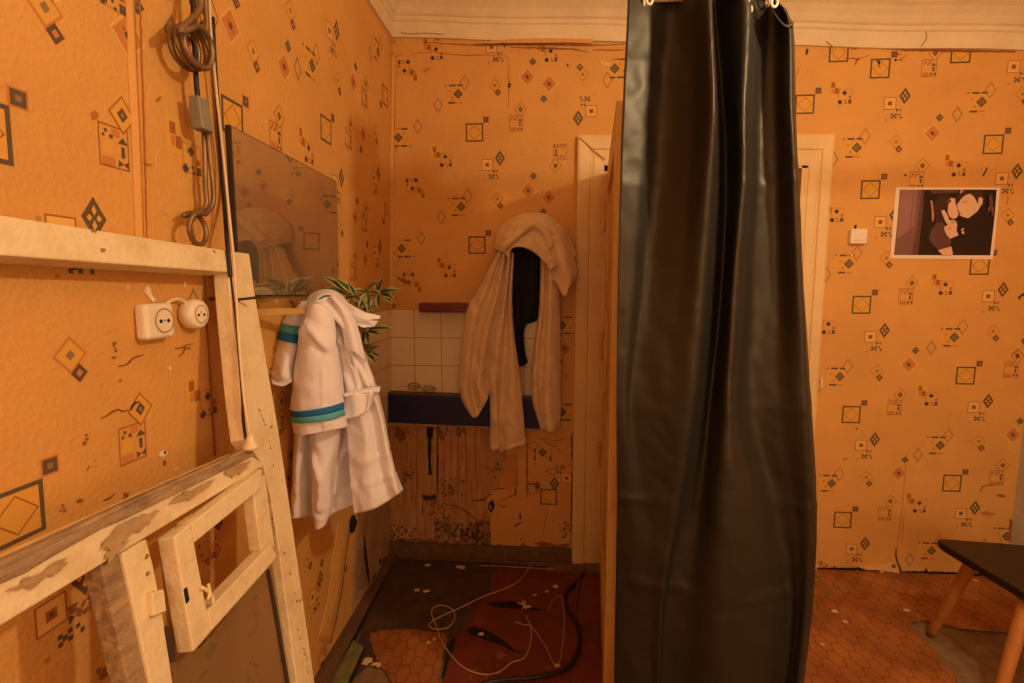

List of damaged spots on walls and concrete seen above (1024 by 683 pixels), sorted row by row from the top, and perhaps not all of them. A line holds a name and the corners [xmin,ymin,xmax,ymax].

crack [100,401,140,419]
leakage [390,505,500,545]